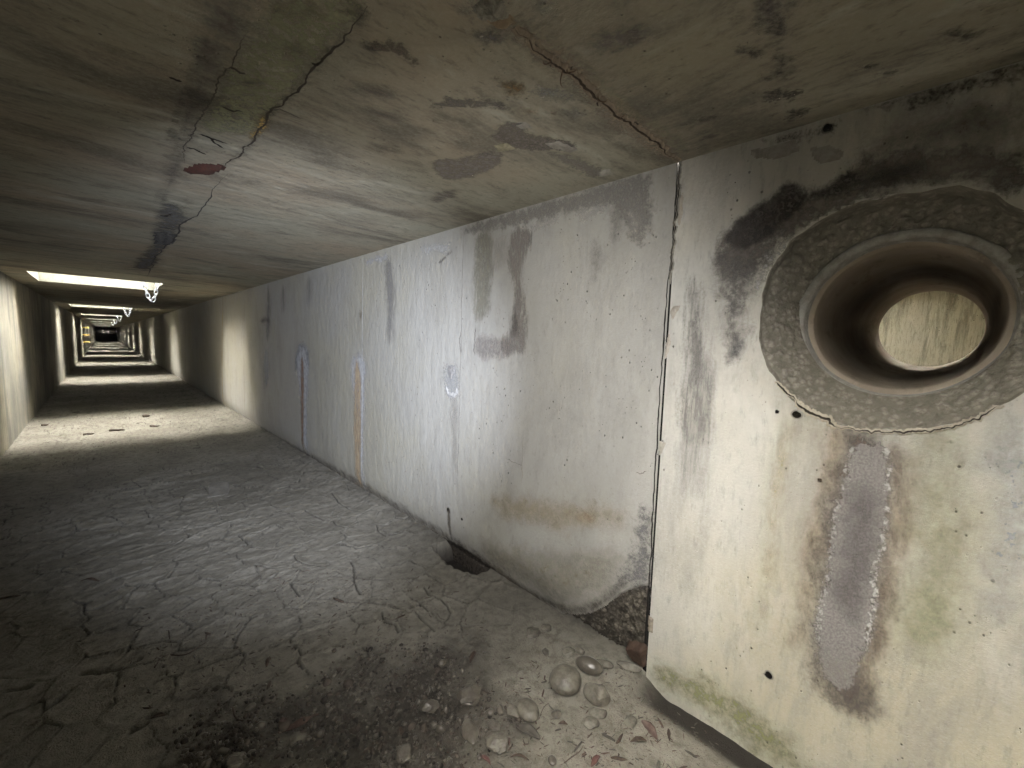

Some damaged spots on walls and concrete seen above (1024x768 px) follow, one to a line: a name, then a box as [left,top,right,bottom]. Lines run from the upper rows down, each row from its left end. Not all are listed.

corrosion [183,163,226,175]
crack [149,6,368,272]
damp [466,175,651,356]
crack [504,23,700,644]
damp [715,113,1024,357]
spalling [573,586,648,669]
damp [811,434,896,713]